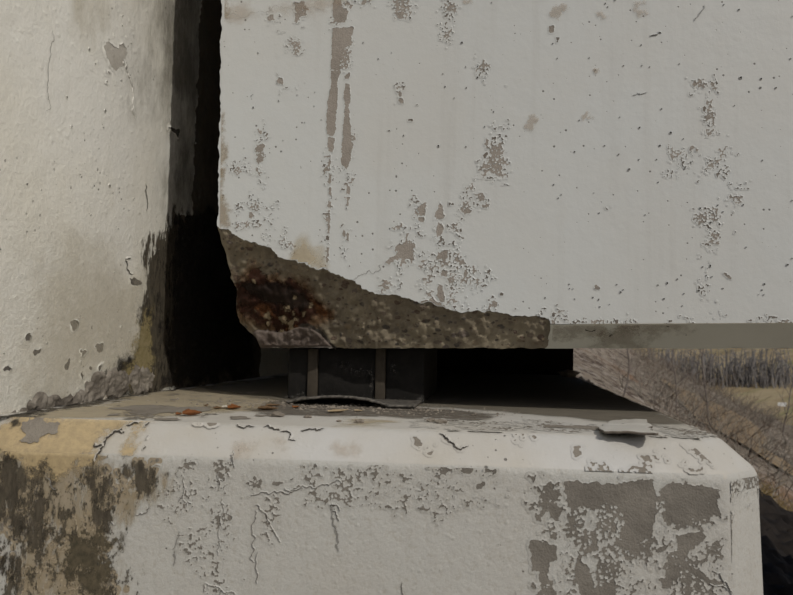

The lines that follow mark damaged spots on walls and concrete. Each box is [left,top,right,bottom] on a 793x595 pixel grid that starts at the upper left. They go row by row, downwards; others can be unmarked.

corrosion [234,266,333,332]
leakage [254,295,313,333]
spalling [12,0,639,443]
leakage [0,205,275,595]
crack [250,479,342,583]
peeling [0,417,601,595]
crack [440,432,469,450]
peeling [522,425,760,595]